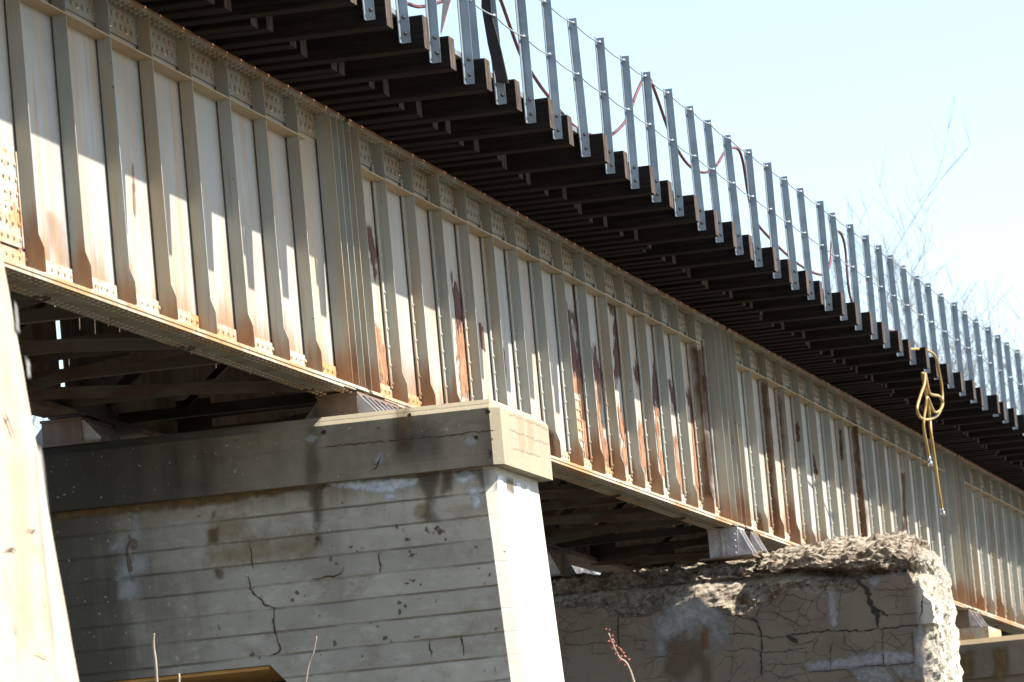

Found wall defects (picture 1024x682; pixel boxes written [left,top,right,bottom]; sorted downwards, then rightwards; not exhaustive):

corrosion [375,325,390,386]
corrosion [455,320,470,401]
crack [325,414,549,471]
corrosion [573,348,715,498]
water stain [313,471,481,525]
crack [245,543,281,656]
crack [700,579,923,682]